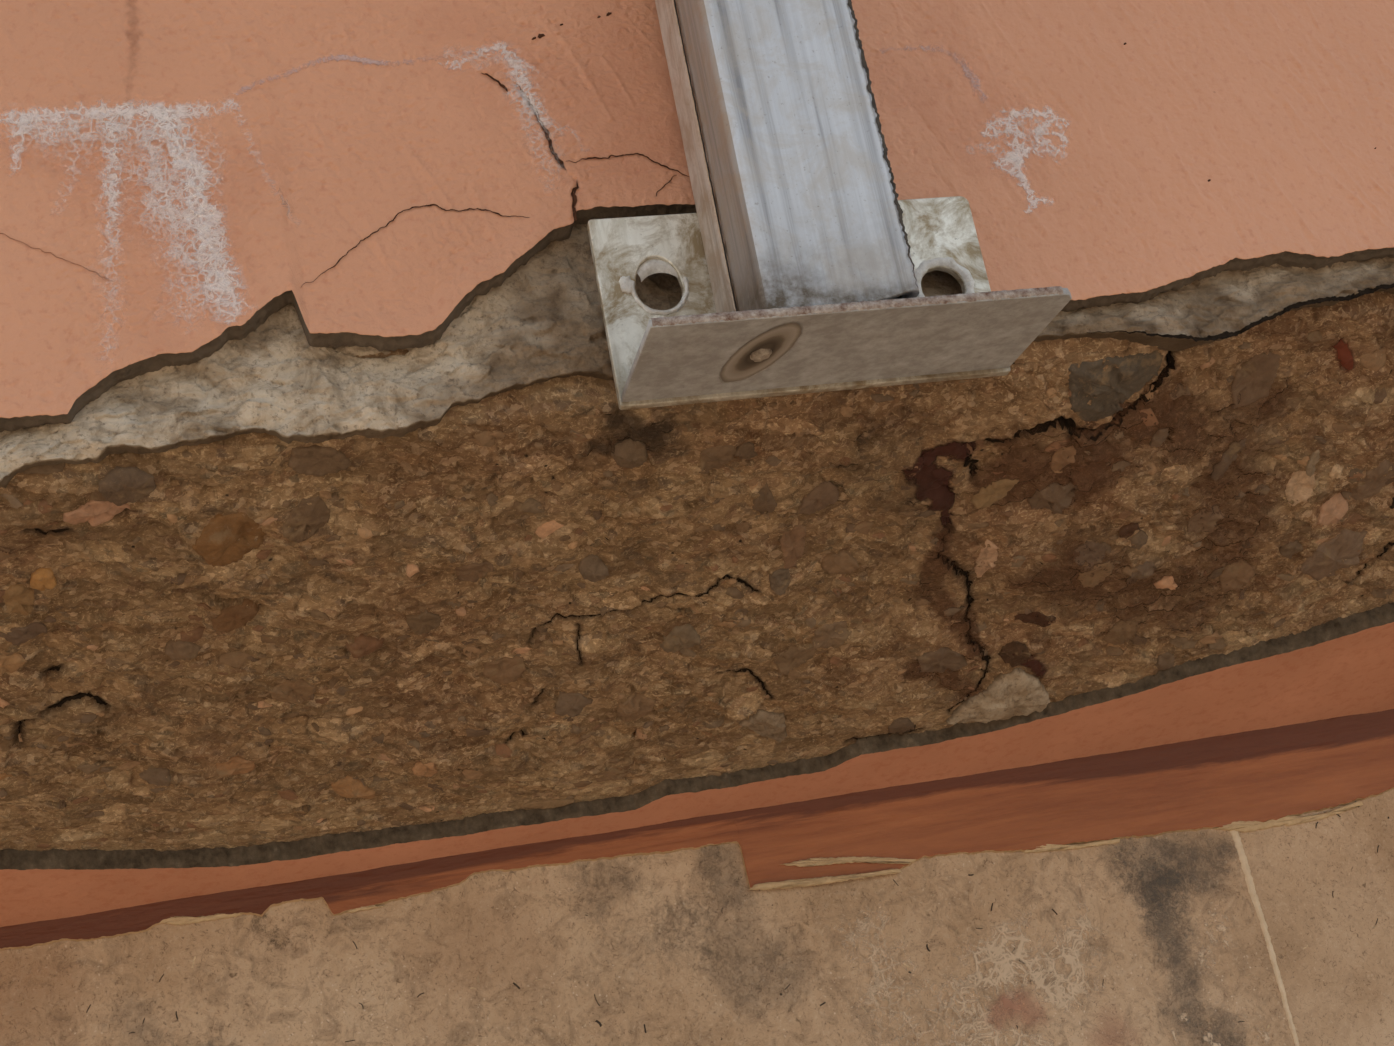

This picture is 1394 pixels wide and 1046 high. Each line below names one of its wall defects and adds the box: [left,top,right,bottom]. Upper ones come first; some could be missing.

crack [482,73,689,221]
crack [301,204,529,287]
spalling [0,218,1394,853]
crack [534,575,758,658]
crack [728,668,772,698]
crack [937,518,991,712]
water stain [1118,839,1242,1046]